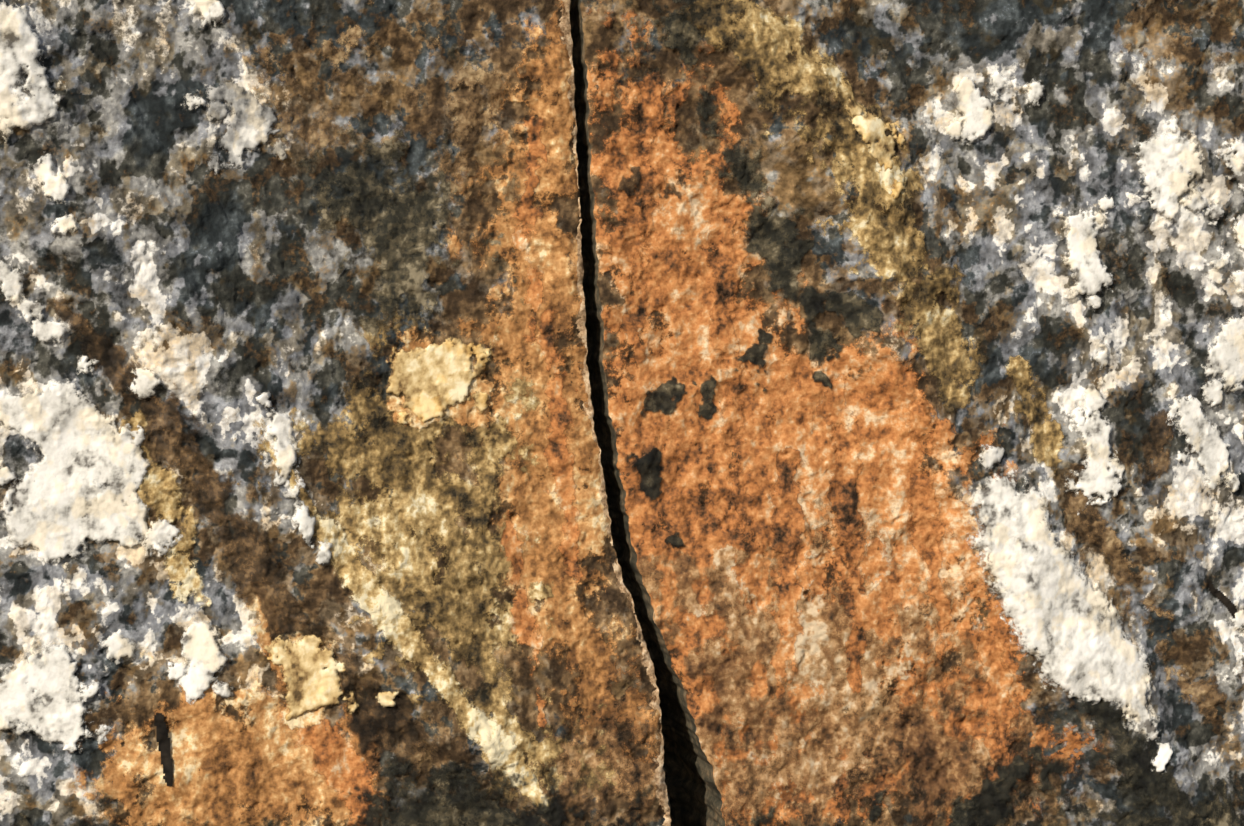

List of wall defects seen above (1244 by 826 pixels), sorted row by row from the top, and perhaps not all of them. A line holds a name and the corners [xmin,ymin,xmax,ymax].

corrosion [69,595,389,826]
crack [558,0,725,826]
corrosion [447,0,1102,826]